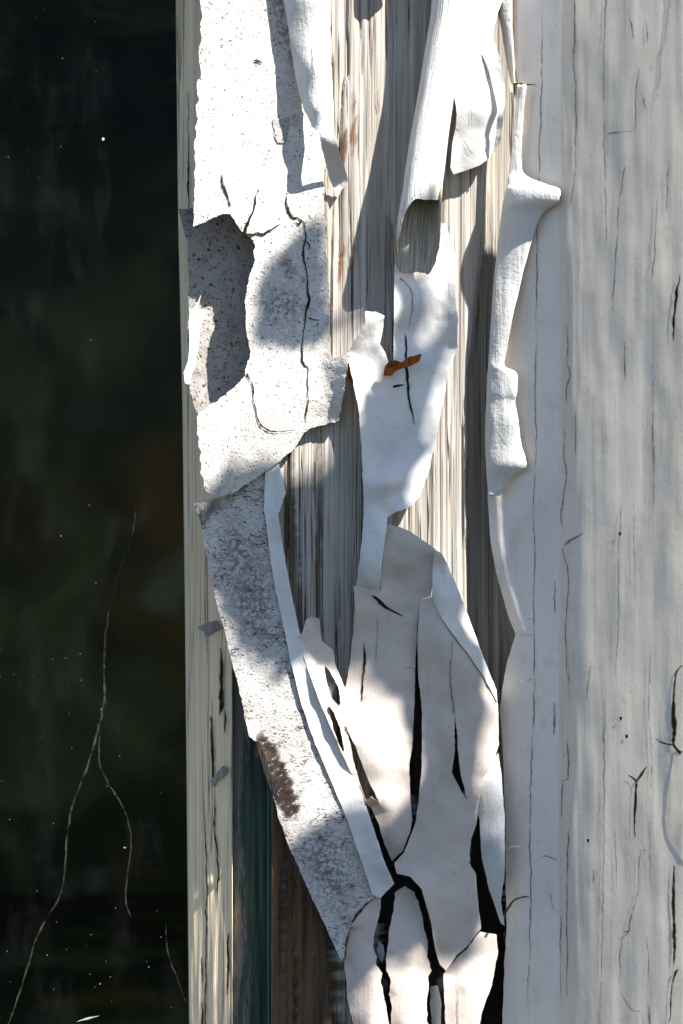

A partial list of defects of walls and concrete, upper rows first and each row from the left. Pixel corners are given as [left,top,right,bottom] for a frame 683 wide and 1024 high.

crack [513,46,542,181]
crack [221,175,316,432]
crack [533,224,541,307]
crack [393,335,414,422]
peeling [179,0,505,1024]
crack [361,596,402,701]
crack [447,643,455,713]
crack [503,329,654,994]
crack [593,665,682,1024]